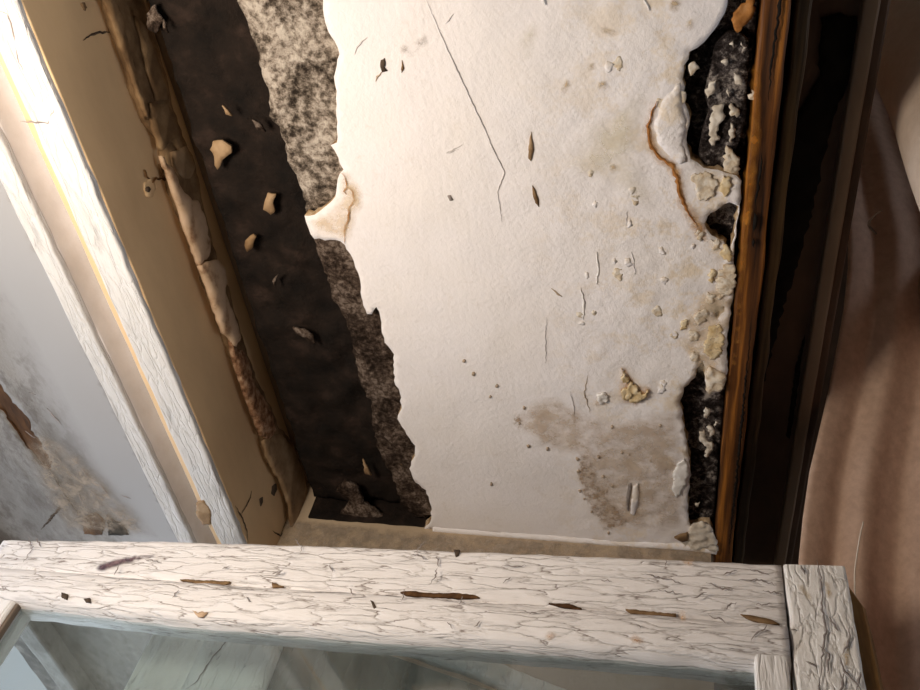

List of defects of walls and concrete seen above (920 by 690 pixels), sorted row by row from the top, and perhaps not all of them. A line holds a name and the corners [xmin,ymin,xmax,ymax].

flaking render [101,0,432,527]
flaking render [646,0,758,552]
peeling [621,368,649,403]
peeling [0,384,105,535]
crack [411,541,439,585]
damp [576,424,674,535]
spalling [626,483,639,515]
crack [800,562,861,690]